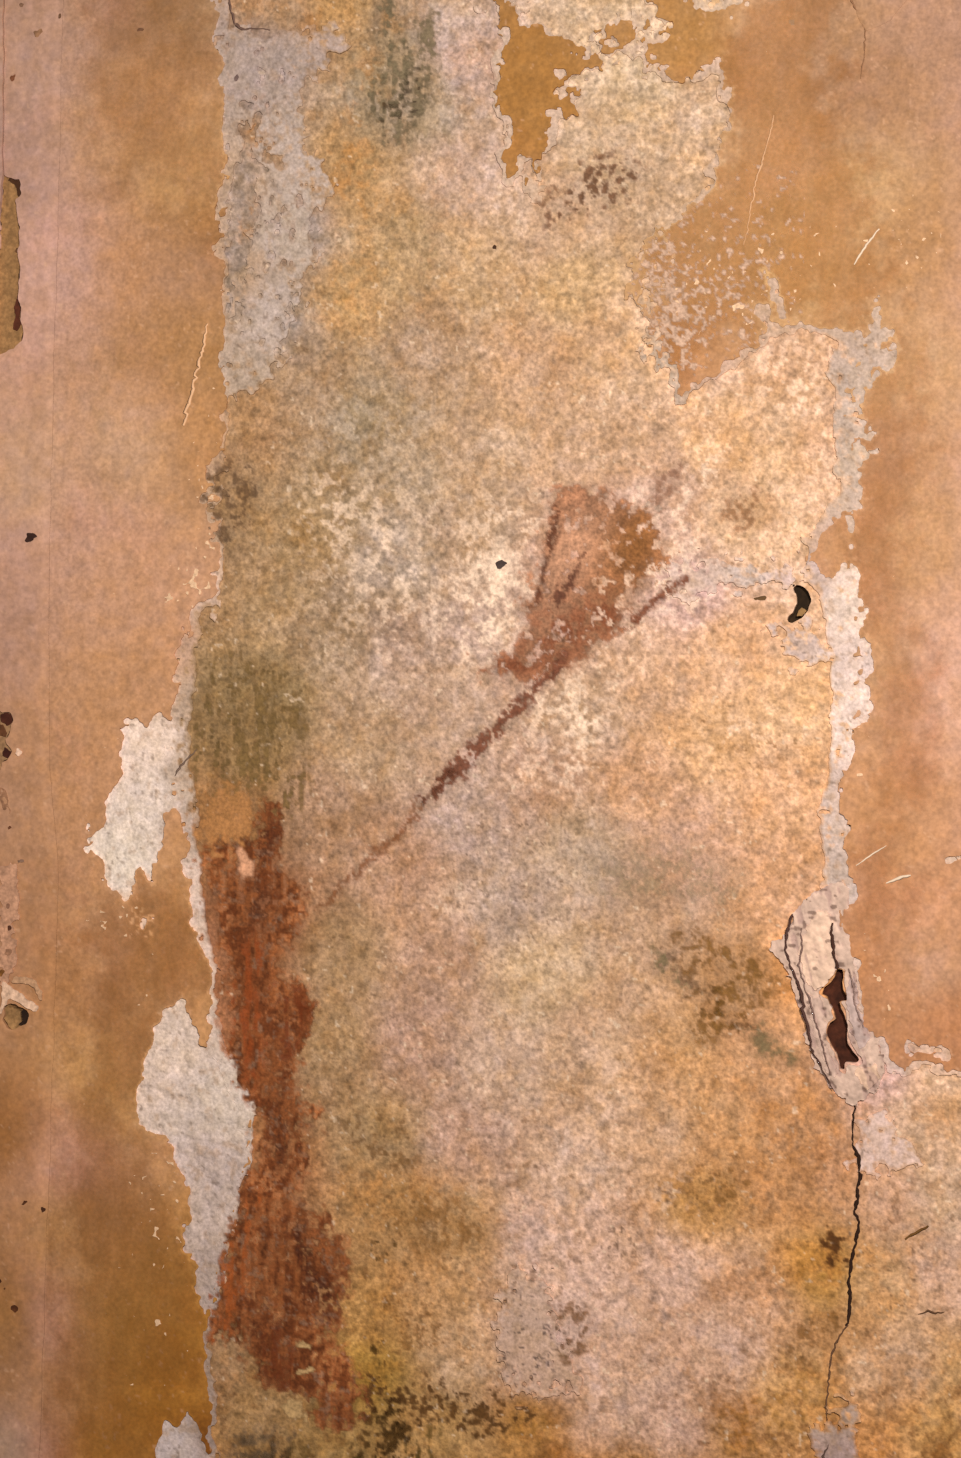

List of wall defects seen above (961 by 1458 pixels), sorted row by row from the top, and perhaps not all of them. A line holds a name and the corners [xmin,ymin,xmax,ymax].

flaking render [683,0,750,20]
peeling [0,175,23,354]
peeling [651,312,706,370]
peeling [639,260,734,322]
flaking render [83,712,175,901]
damp [194,652,307,812]
spalling [769,881,885,1106]
flaking render [136,998,255,1310]
corrosion [194,782,371,1433]
crack [821,1105,863,1458]
flaking render [155,1411,207,1458]
damp [357,1344,536,1458]